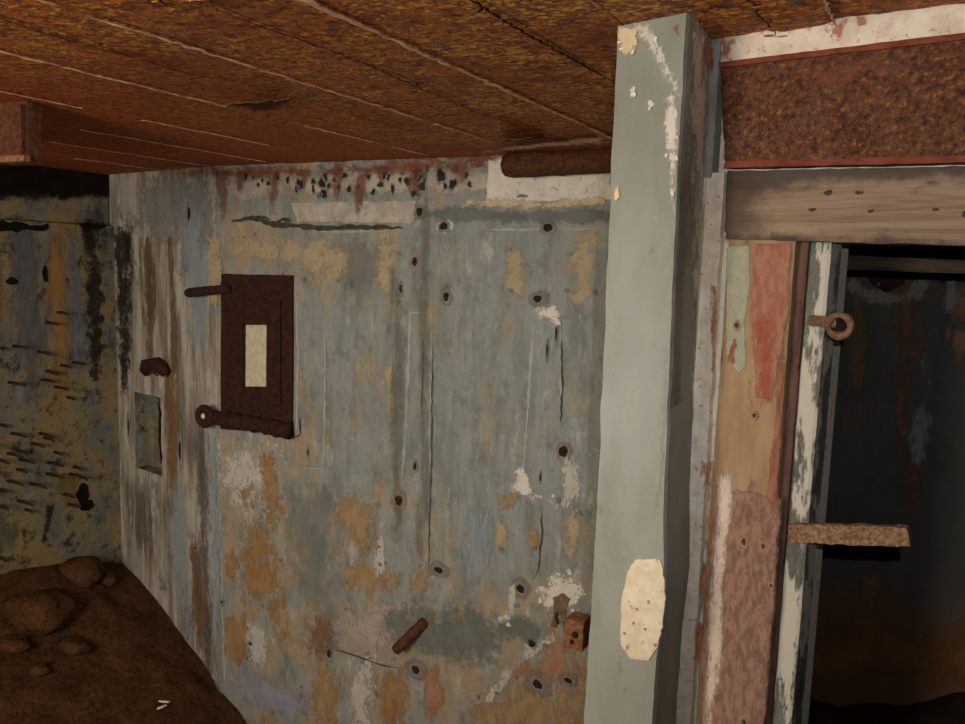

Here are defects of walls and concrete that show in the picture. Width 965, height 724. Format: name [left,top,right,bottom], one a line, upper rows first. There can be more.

crack [0,18,230,82]
crack [152,0,518,126]
crack [470,0,614,83]
crack [747,0,787,37]
corrosion [831,16,865,37]
corrosion [163,155,504,214]
peeling [617,15,709,394]
water stain [0,218,134,406]
corrosion [864,270,910,292]
peeling [699,243,791,724]
corrosion [788,522,912,547]
peeling [458,442,587,724]